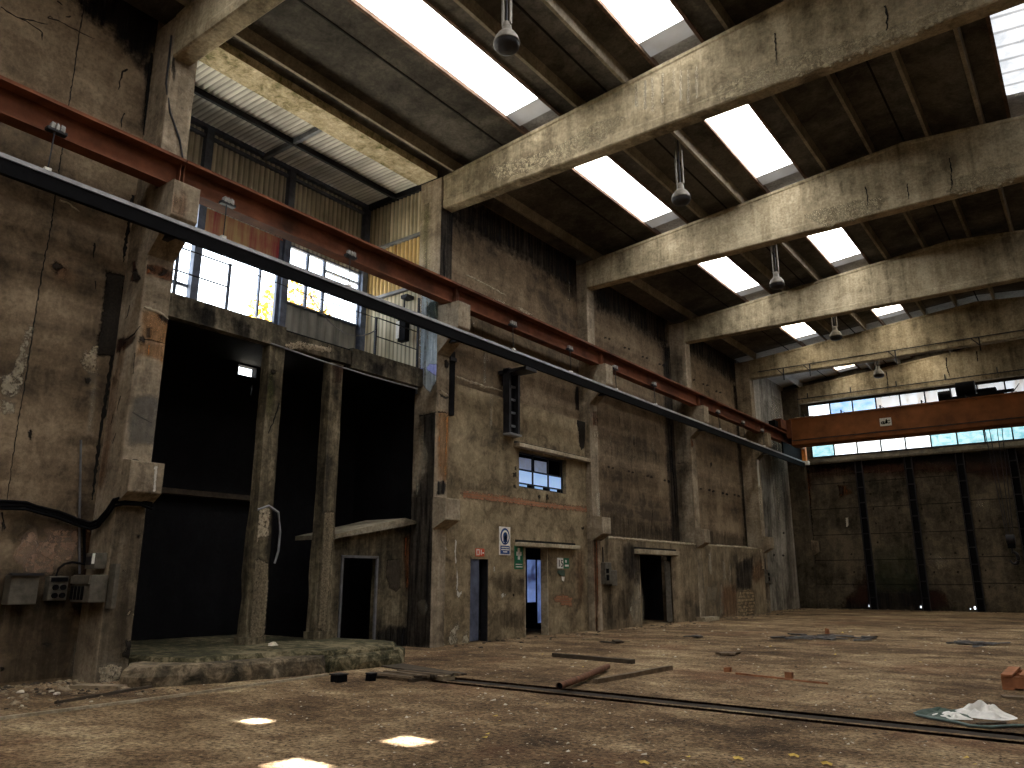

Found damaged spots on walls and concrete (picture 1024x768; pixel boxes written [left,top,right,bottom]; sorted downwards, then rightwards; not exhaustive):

crack [1,0,94,106]
crack [882,5,890,31]
flaking render [0,326,35,414]
crack [1,148,63,530]